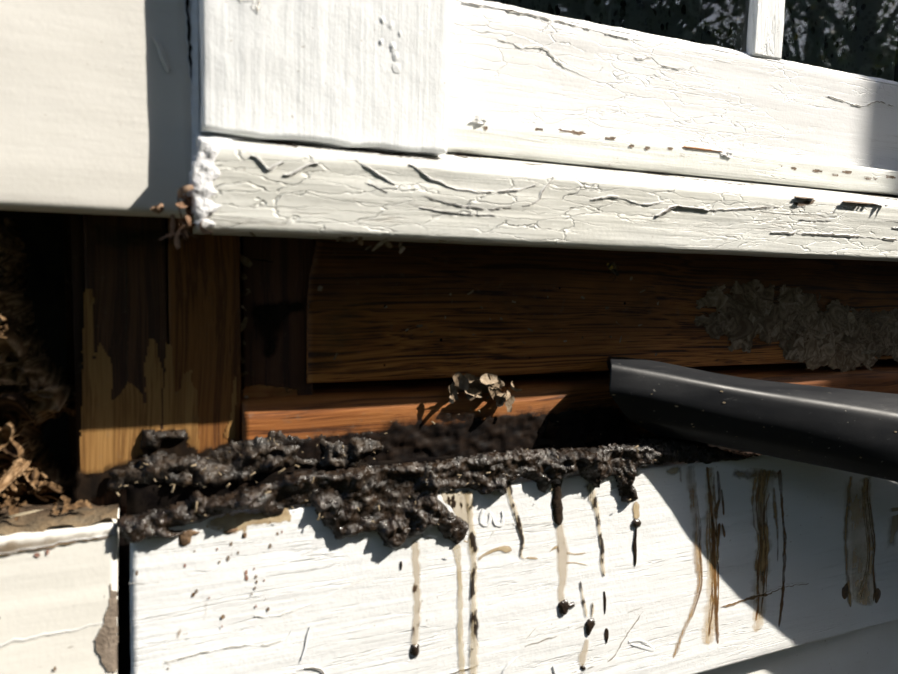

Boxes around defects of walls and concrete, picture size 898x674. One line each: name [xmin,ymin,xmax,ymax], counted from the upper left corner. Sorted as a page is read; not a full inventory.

crack [499,39,603,80]
crack [462,1,694,71]
crack [826,95,897,108]
crack [250,140,554,217]
crack [588,166,898,241]
peeling [80,289,200,474]
water stain [74,429,231,503]
water stain [260,406,652,481]
water stain [206,507,291,563]
peeling [94,584,119,673]
water stain [410,583,421,657]
water stain [453,544,465,673]